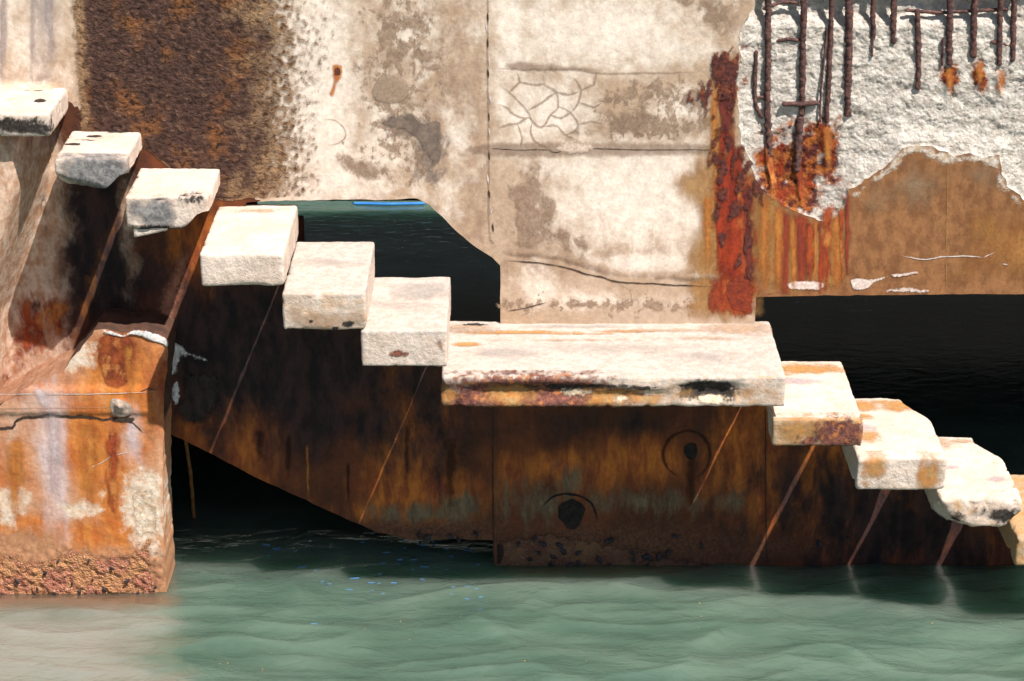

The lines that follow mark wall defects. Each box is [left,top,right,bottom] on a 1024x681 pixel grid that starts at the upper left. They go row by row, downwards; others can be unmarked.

rust [330,65,342,95]
crack [486,12,699,232]
spalling [735,0,1024,221]
rust [450,47,850,346]
crack [506,260,712,287]
rust [13,299,67,365]
crack [0,388,155,467]
rust [98,335,135,393]
rust [293,310,357,329]
rust [489,385,535,407]
rust [588,389,663,405]
rust [782,400,911,485]